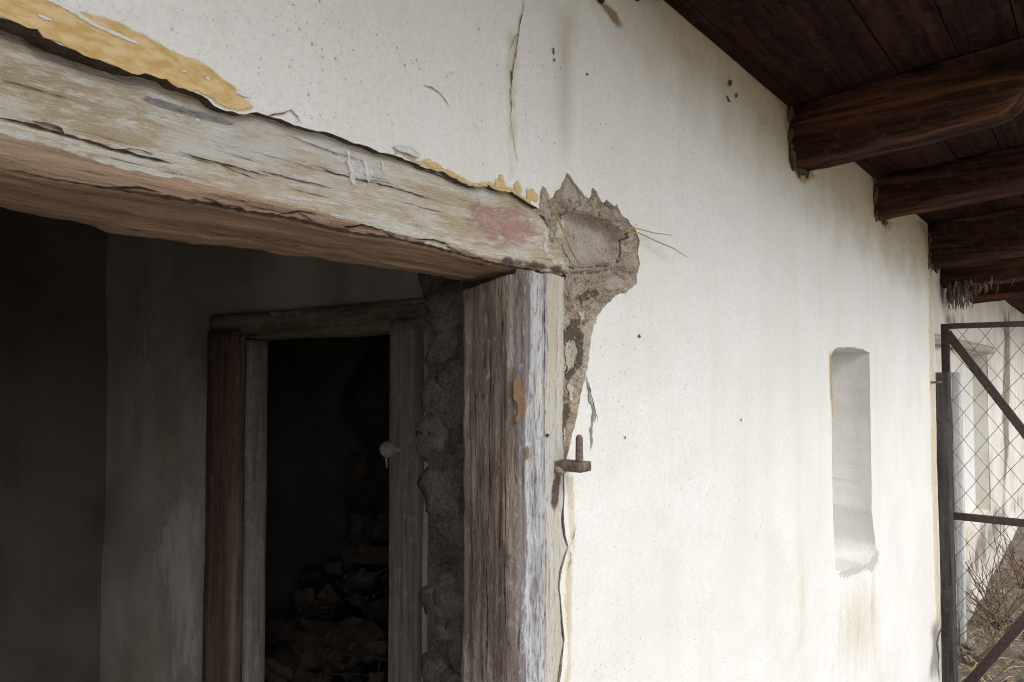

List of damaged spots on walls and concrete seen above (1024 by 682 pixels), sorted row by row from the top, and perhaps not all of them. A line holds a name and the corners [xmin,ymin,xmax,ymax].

peeling [0,0,252,125]
crack [510,0,525,160]
flaking render [393,145,639,450]
crack [534,397,576,682]